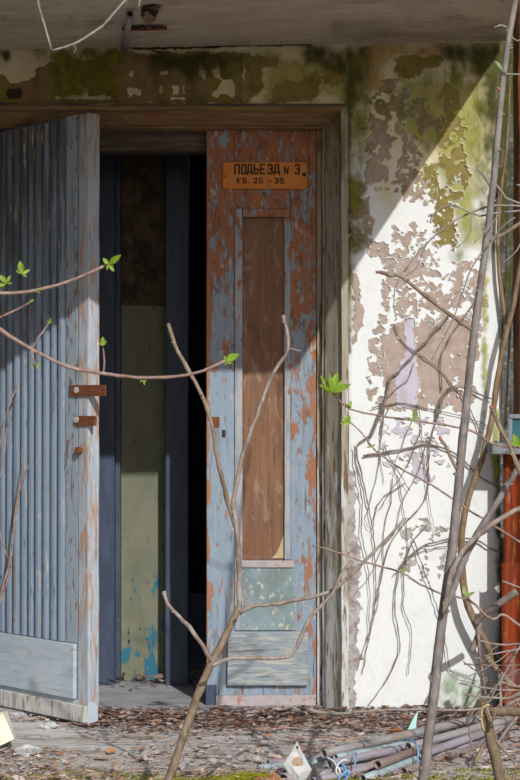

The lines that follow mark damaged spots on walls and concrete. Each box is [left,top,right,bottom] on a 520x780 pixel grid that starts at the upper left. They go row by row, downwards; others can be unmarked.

peeling [0,51,346,104]
peeling [348,54,489,484]